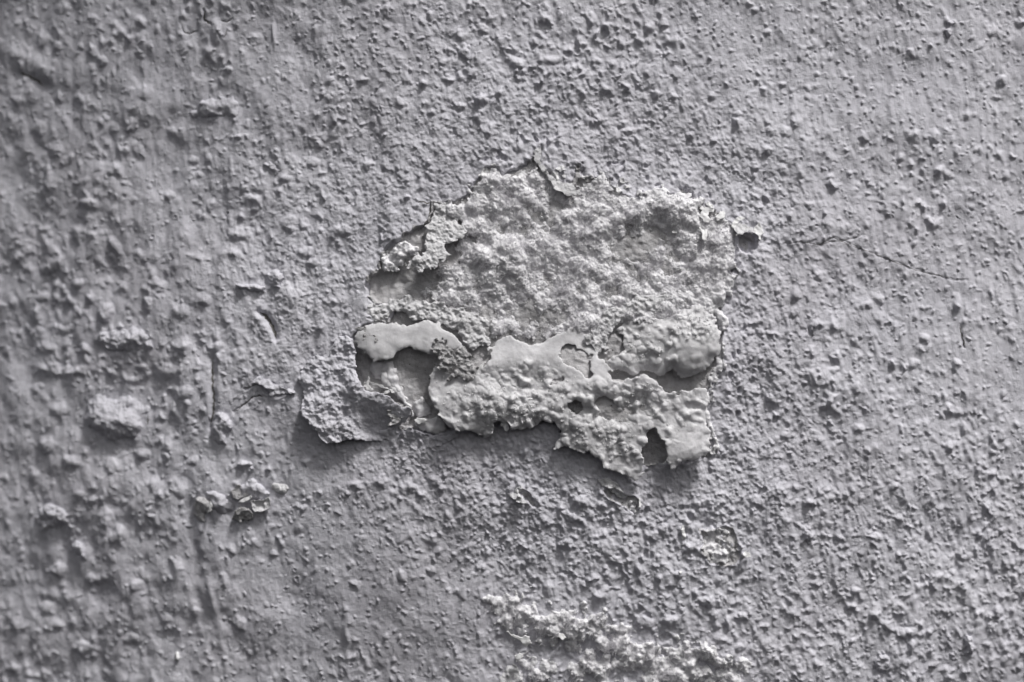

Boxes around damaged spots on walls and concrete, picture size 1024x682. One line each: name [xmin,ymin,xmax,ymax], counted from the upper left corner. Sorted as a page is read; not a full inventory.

flaking render [297,147,764,446]
flaking render [641,428,668,466]